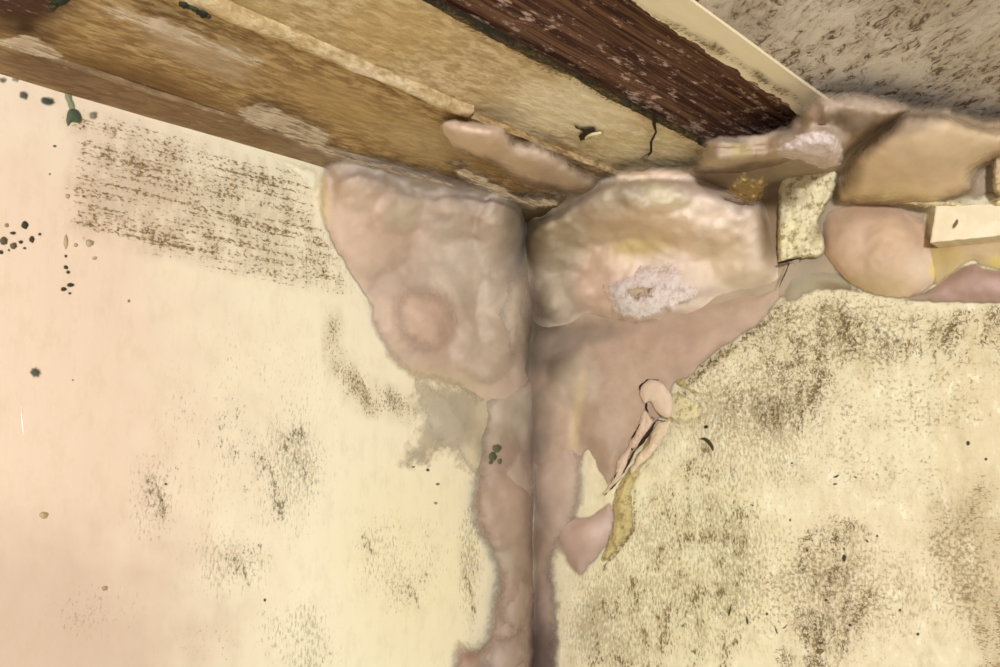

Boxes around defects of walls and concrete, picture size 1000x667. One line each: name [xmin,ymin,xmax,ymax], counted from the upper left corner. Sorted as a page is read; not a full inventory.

leakage [61,93,344,294]
crack [638,110,657,158]
leakage [683,302,1000,435]
flaking render [598,378,714,577]
leakage [588,452,768,667]
leakage [775,516,878,667]
leakage [957,580,1000,667]